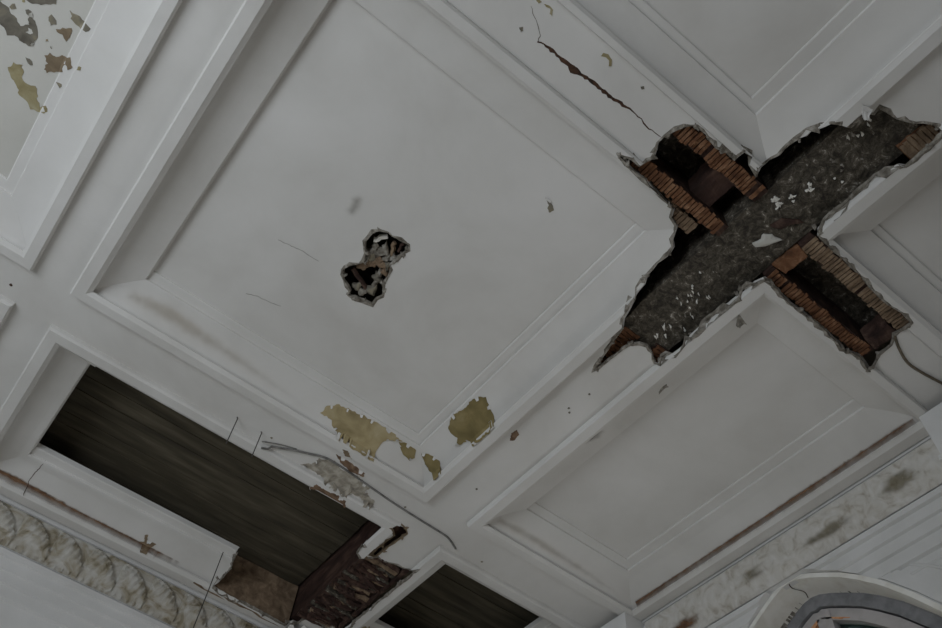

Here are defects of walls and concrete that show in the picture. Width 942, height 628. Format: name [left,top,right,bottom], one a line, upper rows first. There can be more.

peeling [0,0,90,114]
crack [531,7,660,137]
spalling [340,227,410,307]
peeling [300,404,441,510]
peeling [448,396,494,447]
spalling [368,524,409,557]